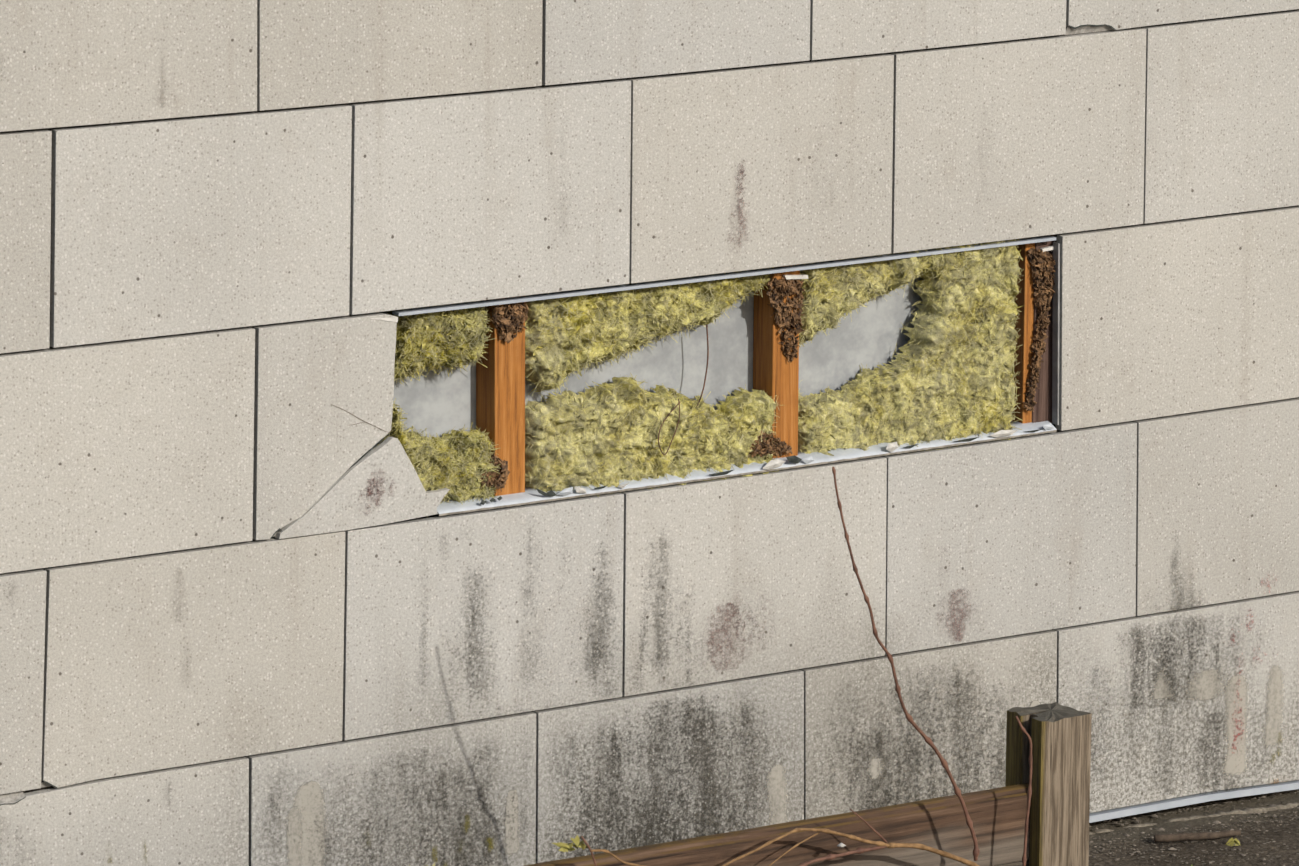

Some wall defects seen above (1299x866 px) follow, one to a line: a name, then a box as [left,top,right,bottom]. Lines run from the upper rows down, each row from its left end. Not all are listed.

crack [331,404,390,473]
leakage [1136,643,1248,775]
leakage [287,781,328,866]
leakage [505,790,519,854]
leakage [588,710,728,854]
leakage [743,712,787,825]
leakage [857,737,891,800]